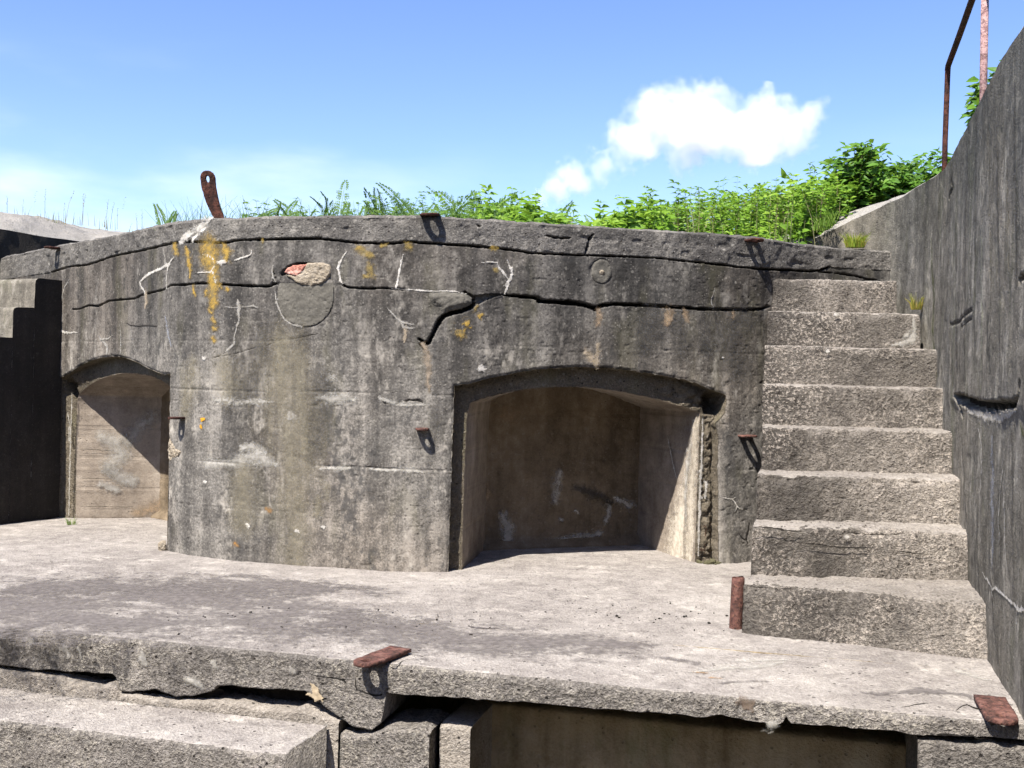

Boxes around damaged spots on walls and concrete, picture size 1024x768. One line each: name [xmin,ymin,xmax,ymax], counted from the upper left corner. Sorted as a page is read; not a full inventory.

efflorescence [139,248,174,308]
crack [77,283,278,327]
efflorescence [197,250,252,283]
efflorescence [225,299,257,352]
spalling [285,262,331,286]
crack [343,283,394,291]
crack [419,304,473,354]
crack [126,235,873,281]
crack [503,295,759,311]
crack [78,672,383,701]